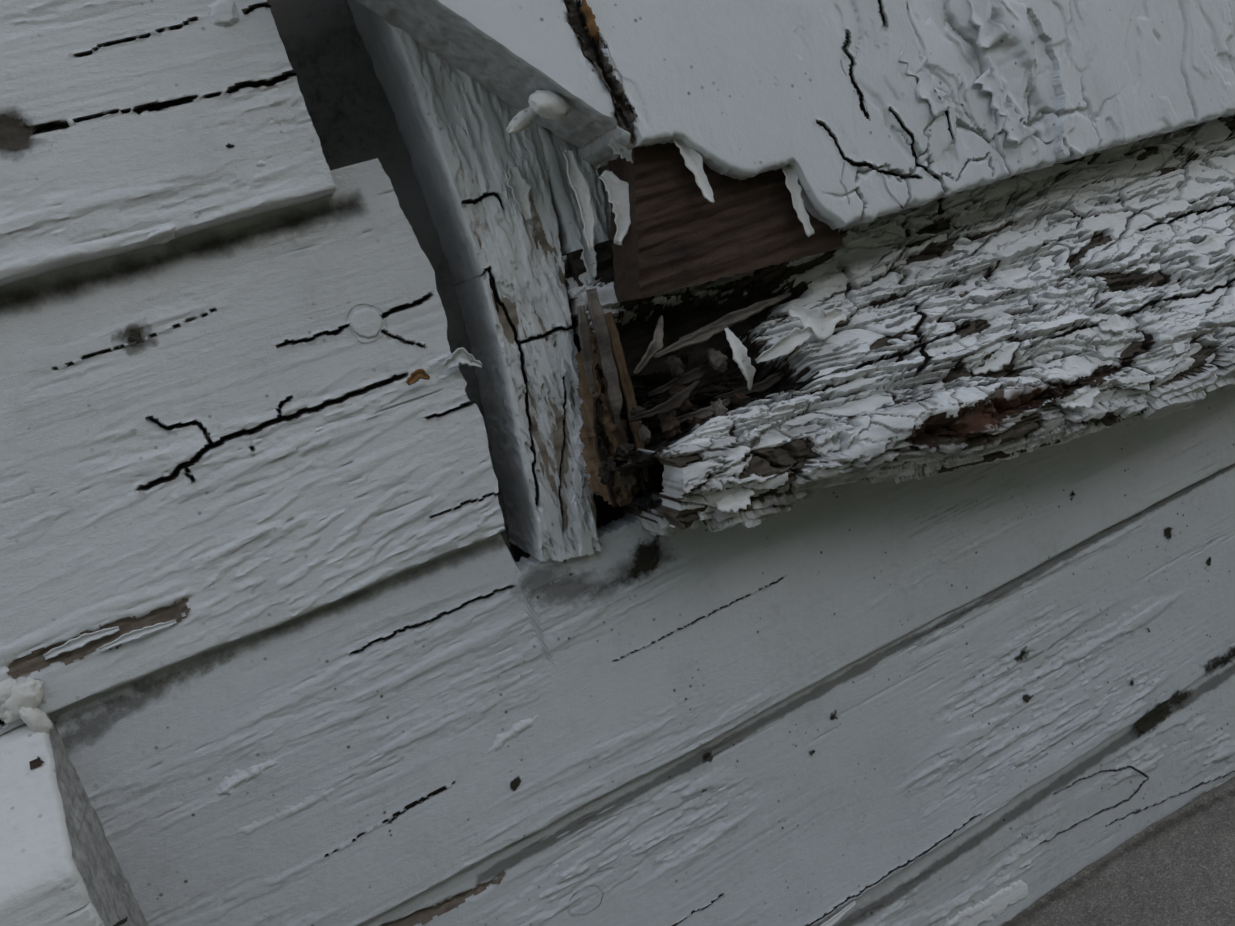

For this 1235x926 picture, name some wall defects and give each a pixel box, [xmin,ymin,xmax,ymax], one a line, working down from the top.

crack [31,73,297,133]
crack [816,33,939,208]
crack [140,375,405,489]
crack [280,295,430,347]
crack [481,267,575,531]
peeling [563,138,847,491]
peeling [970,343,1018,375]
peeling [903,360,1136,449]
peeling [716,488,755,513]
peeling [7,598,191,679]
crack [350,585,513,654]
peeling [383,871,506,926]